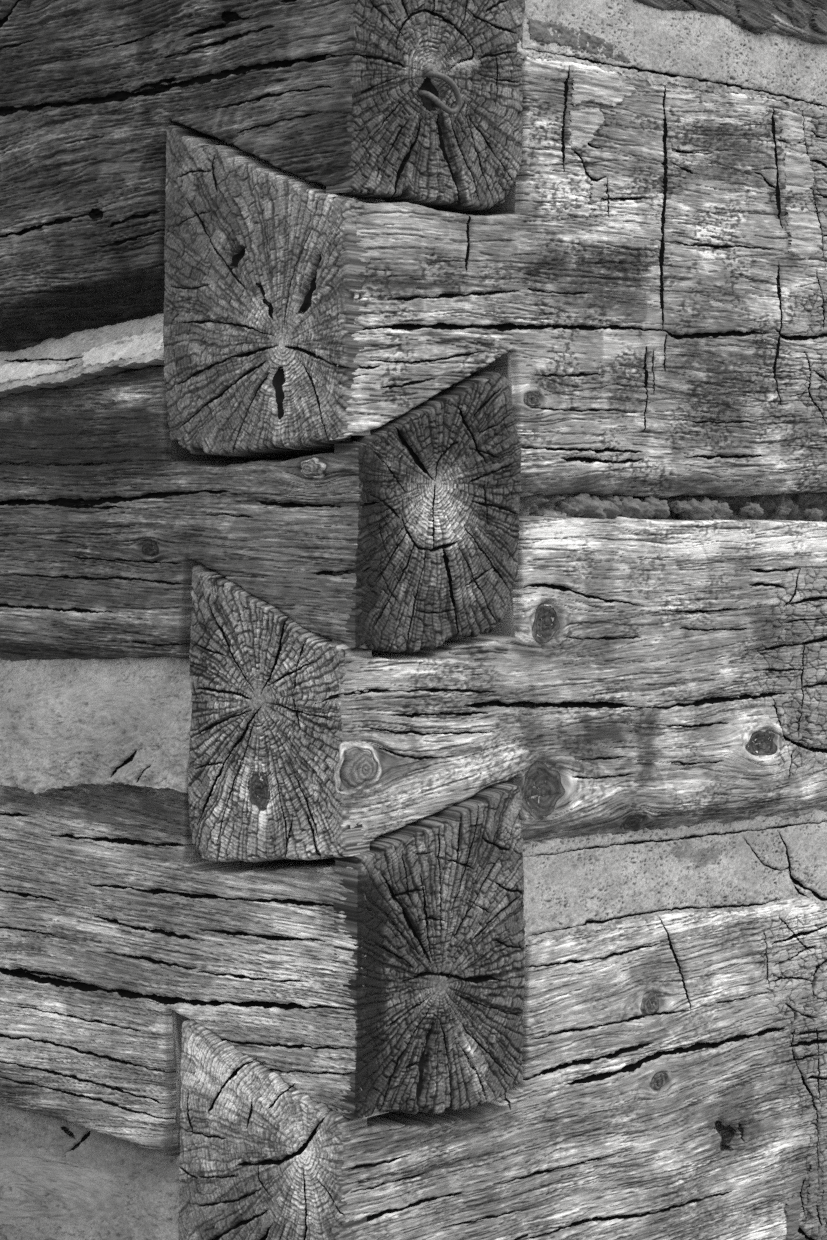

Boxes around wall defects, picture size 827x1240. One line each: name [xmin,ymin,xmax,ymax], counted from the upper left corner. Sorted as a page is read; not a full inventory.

crack [0,0,827,452]
crack [0,387,827,860]
crack [0,805,827,1240]